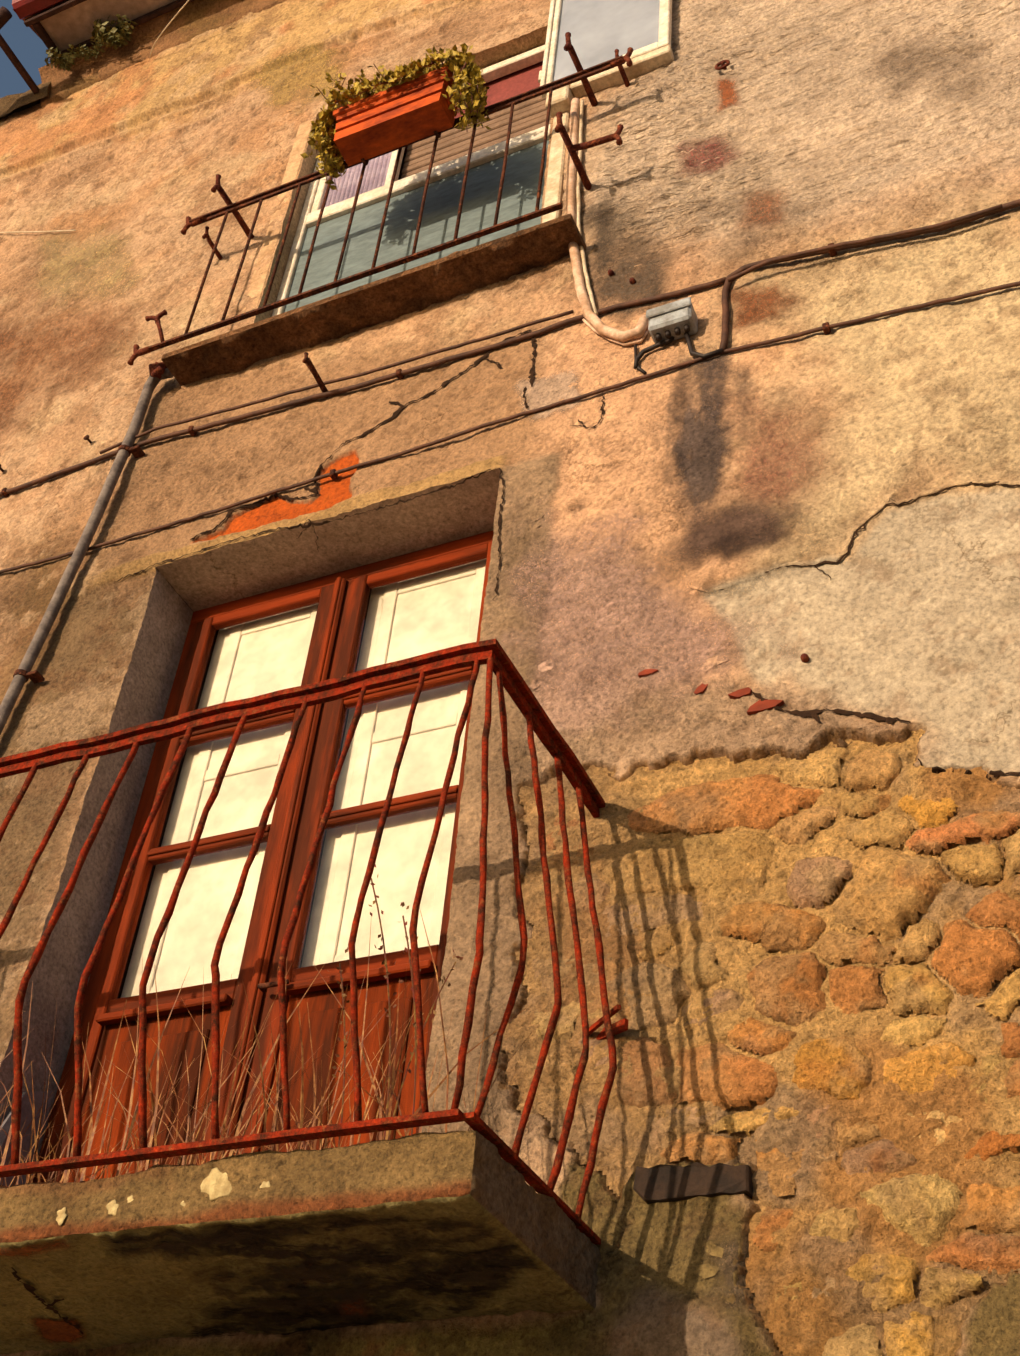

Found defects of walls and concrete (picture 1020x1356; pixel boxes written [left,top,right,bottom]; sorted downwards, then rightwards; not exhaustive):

rust [682,141,732,171]
spalling [206,454,359,541]
crack [114,327,541,600]
water stain [669,355,813,564]
crack [690,478,1020,593]
spalling [501,729,1020,1356]
water stain [106,1195,134,1216]
crack [11,1267,83,1334]
water stain [109,1216,535,1356]